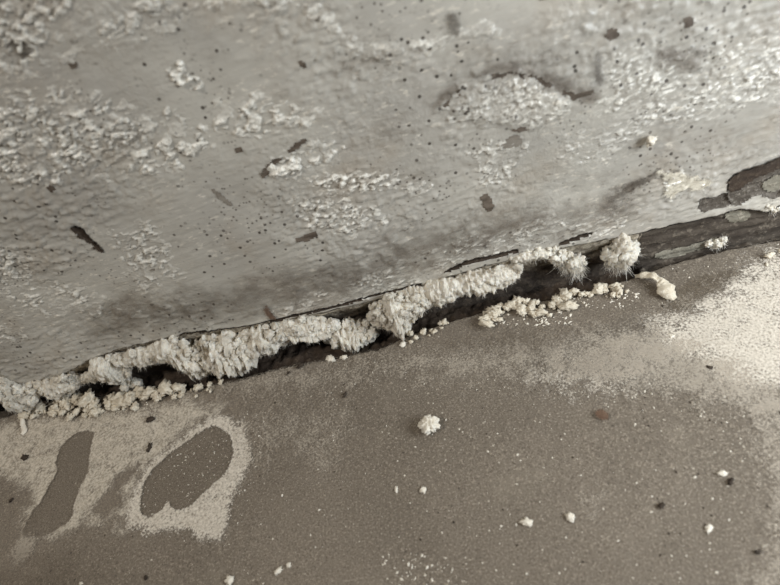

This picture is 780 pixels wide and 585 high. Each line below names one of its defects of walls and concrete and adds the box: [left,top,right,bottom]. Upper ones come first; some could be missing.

crack [211,189,233,206]
crack [445,249,519,272]
crack [559,233,592,246]
damp [600,232,643,279]
peeling [631,157,780,301]
crack [179,283,422,336]
damp [0,244,780,585]